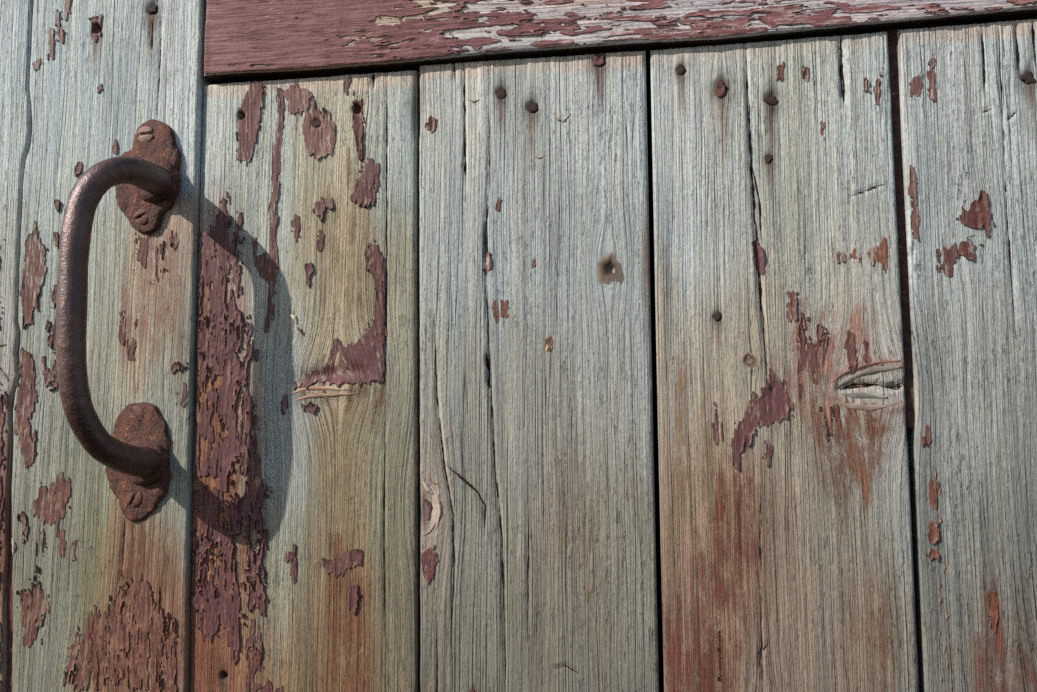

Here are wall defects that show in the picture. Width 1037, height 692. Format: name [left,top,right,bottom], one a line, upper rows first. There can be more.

peeling [32,0,72,71]
peeling [88,14,102,42]
crack [454,63,490,255]
peeling [204,0,1037,208]
peeling [908,165,920,241]
peeling [936,190,994,277]
peeling [0,220,79,648]
peeling [171,83,336,692]
peeling [280,239,387,415]
crack [434,299,529,692]
peeling [711,291,827,470]
peeling [63,574,177,692]